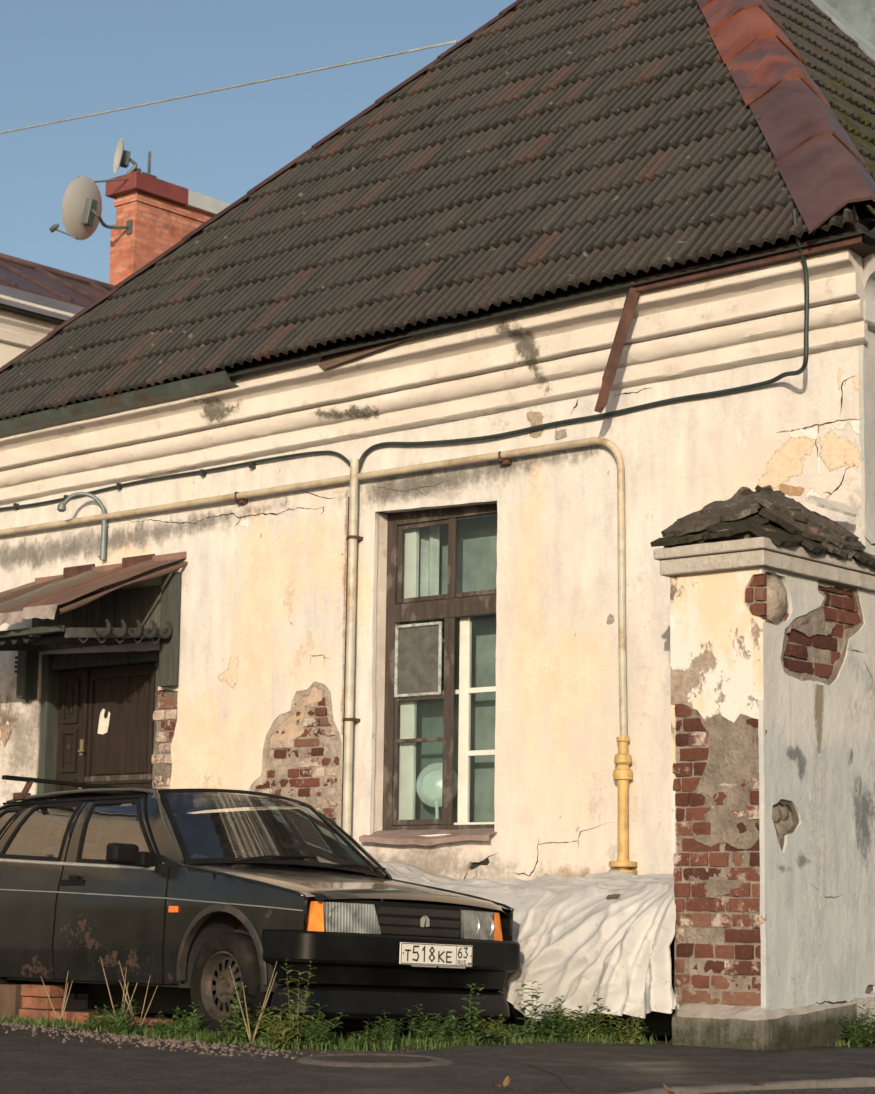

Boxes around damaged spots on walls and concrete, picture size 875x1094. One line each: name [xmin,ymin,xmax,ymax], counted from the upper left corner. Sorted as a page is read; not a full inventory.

water stain [497,318,549,391]
crack [776,376,859,455]
peeling [755,420,861,503]
water stain [0,513,228,564]
crack [124,490,333,526]
spalling [745,572,864,685]
spalling [249,681,342,827]
crack [464,822,614,879]
spalling [672,704,799,1006]